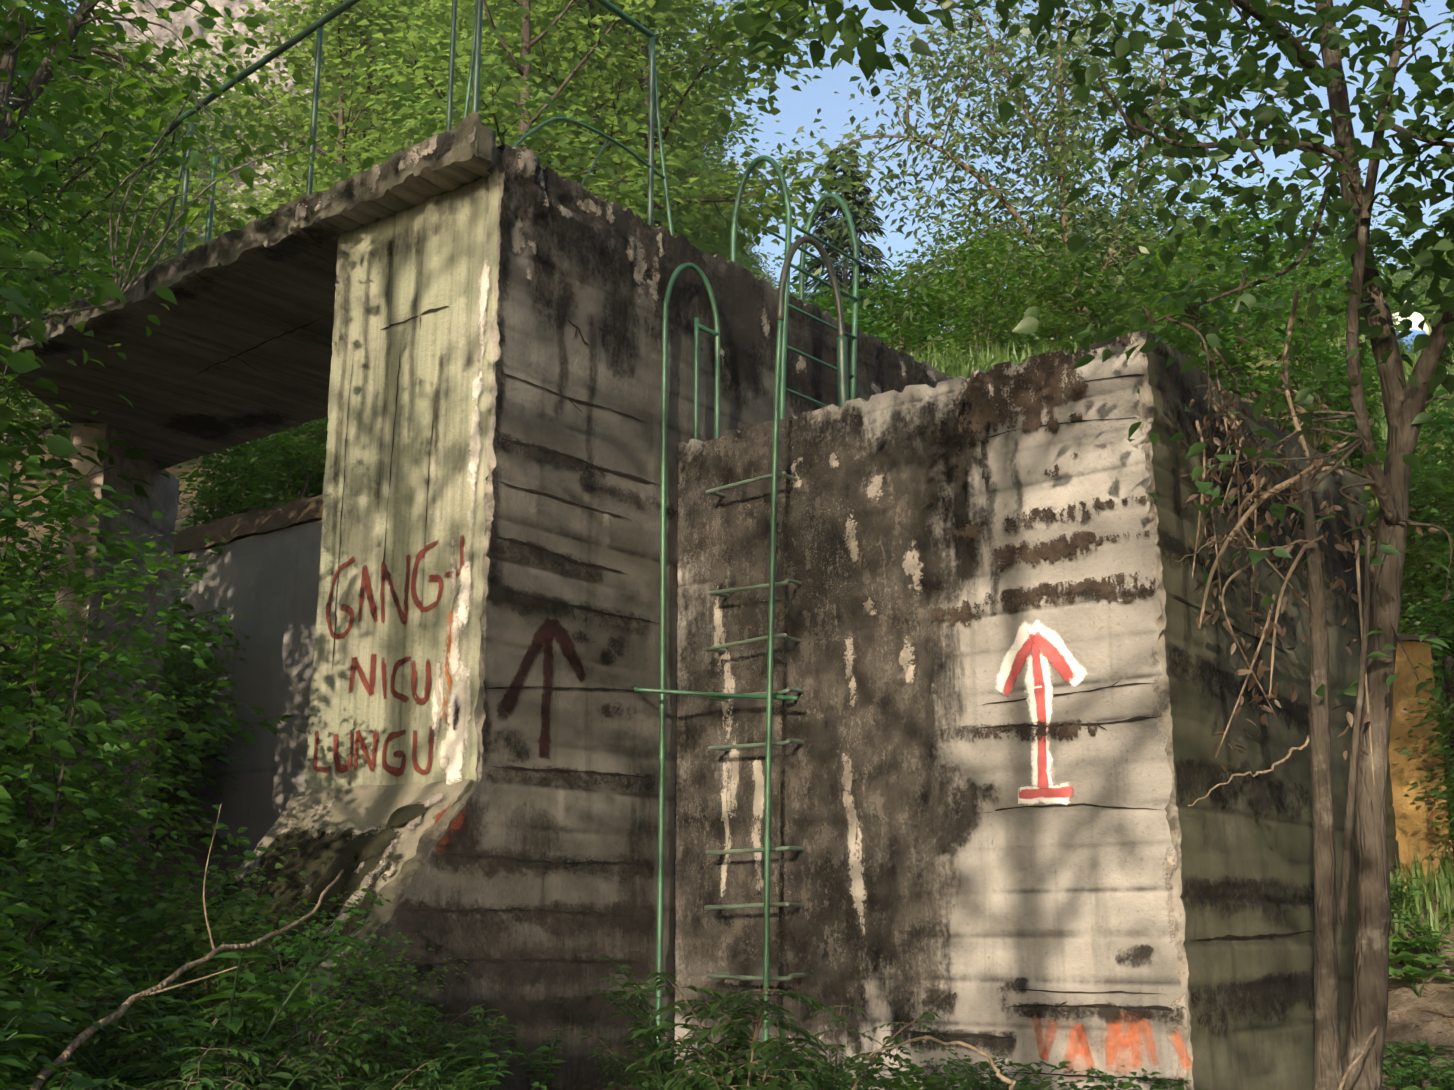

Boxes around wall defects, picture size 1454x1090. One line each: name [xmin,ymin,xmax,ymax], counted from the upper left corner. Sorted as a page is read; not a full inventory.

crack [330,306,449,690]
leakage [304,149,1373,1090]
peeling [957,332,1133,438]